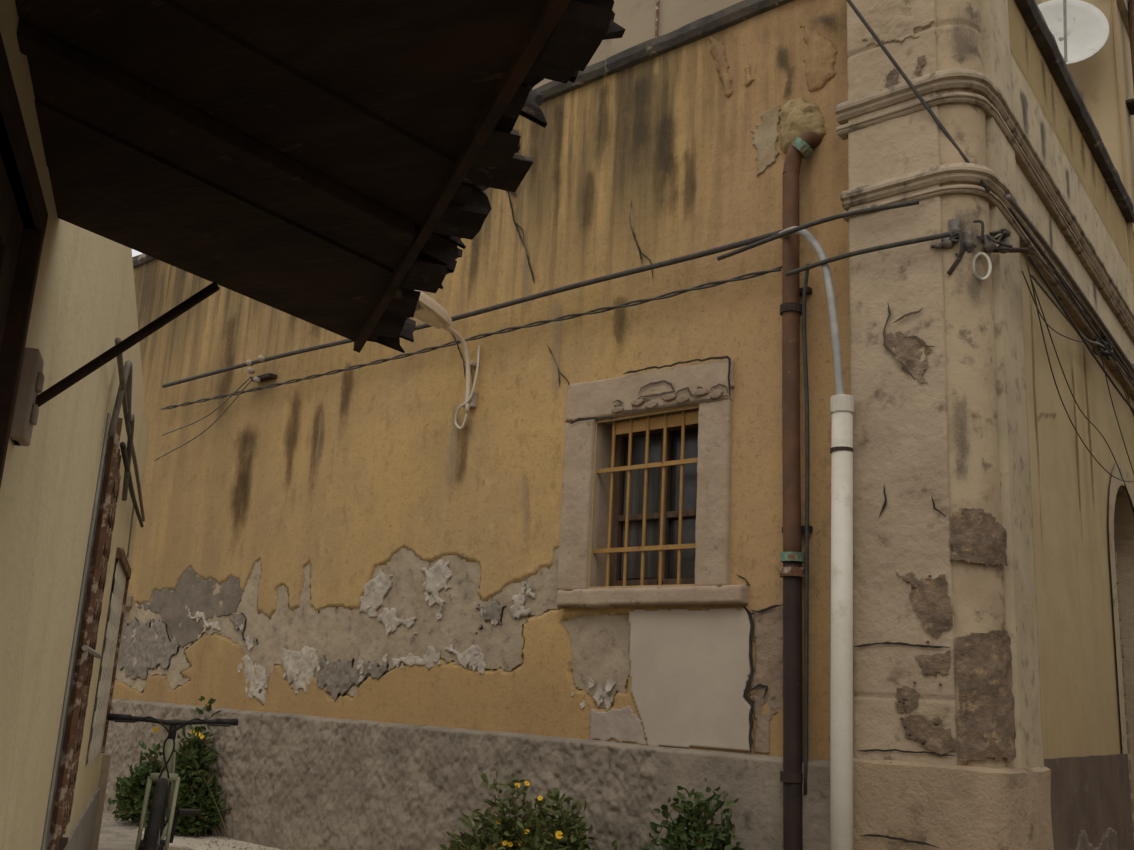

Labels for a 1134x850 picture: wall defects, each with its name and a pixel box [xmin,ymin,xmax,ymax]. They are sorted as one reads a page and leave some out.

crack [506,191,534,282]
crack [629,201,653,277]
spalling [883,304,935,384]
spalling [950,508,1008,567]
peeling [115,547,630,710]
spalling [748,607,783,754]
crack [853,641,949,649]
spalling [895,572,1016,762]
crack [858,748,955,756]